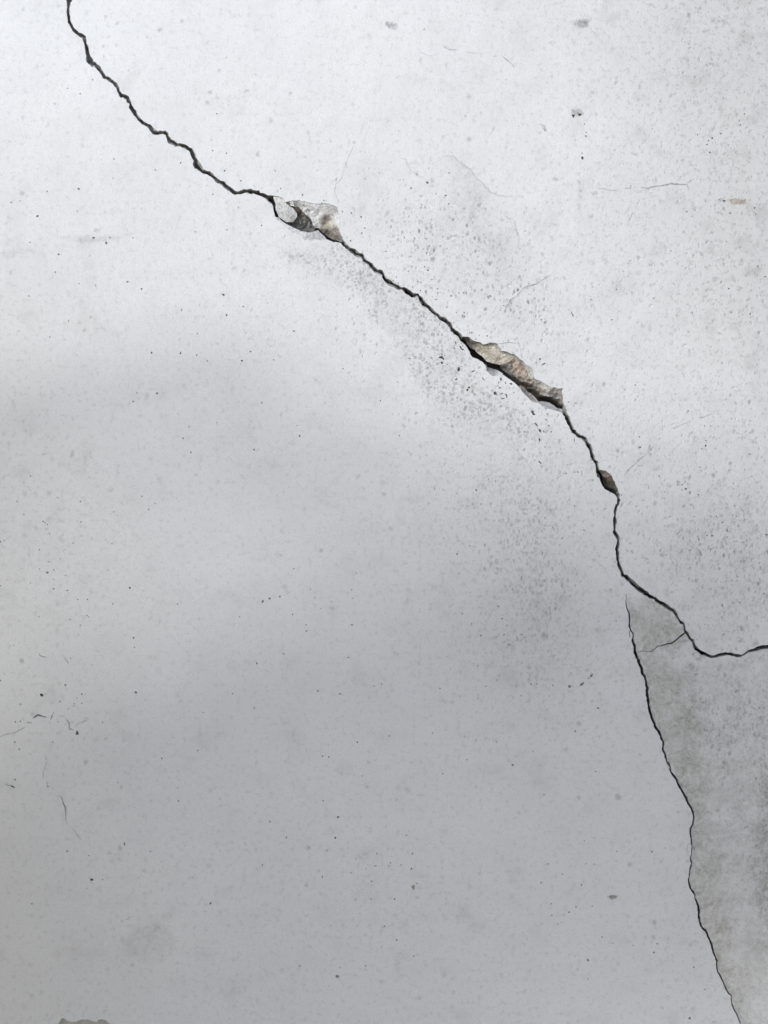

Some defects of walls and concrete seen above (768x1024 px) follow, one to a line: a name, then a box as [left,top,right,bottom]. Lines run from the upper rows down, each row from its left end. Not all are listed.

crack [66,0,545,395]
spalling [273,196,344,242]
spalling [438,337,578,441]
spalling [596,469,618,497]
crack [553,387,768,1024]